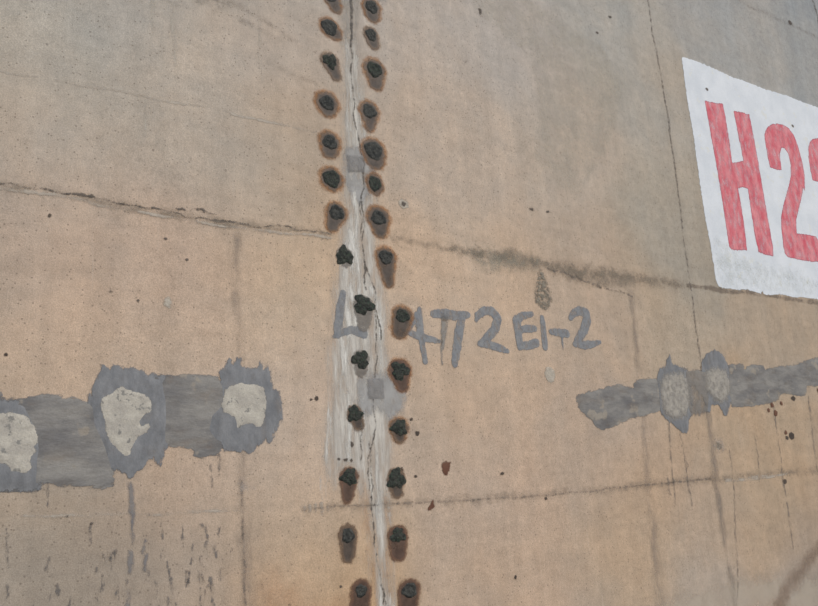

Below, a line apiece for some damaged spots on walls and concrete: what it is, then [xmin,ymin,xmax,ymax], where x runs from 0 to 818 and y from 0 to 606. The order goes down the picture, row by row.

crack [0,182,331,239]
crack [350,0,382,374]
crack [532,261,651,288]
crack [360,399,377,555]